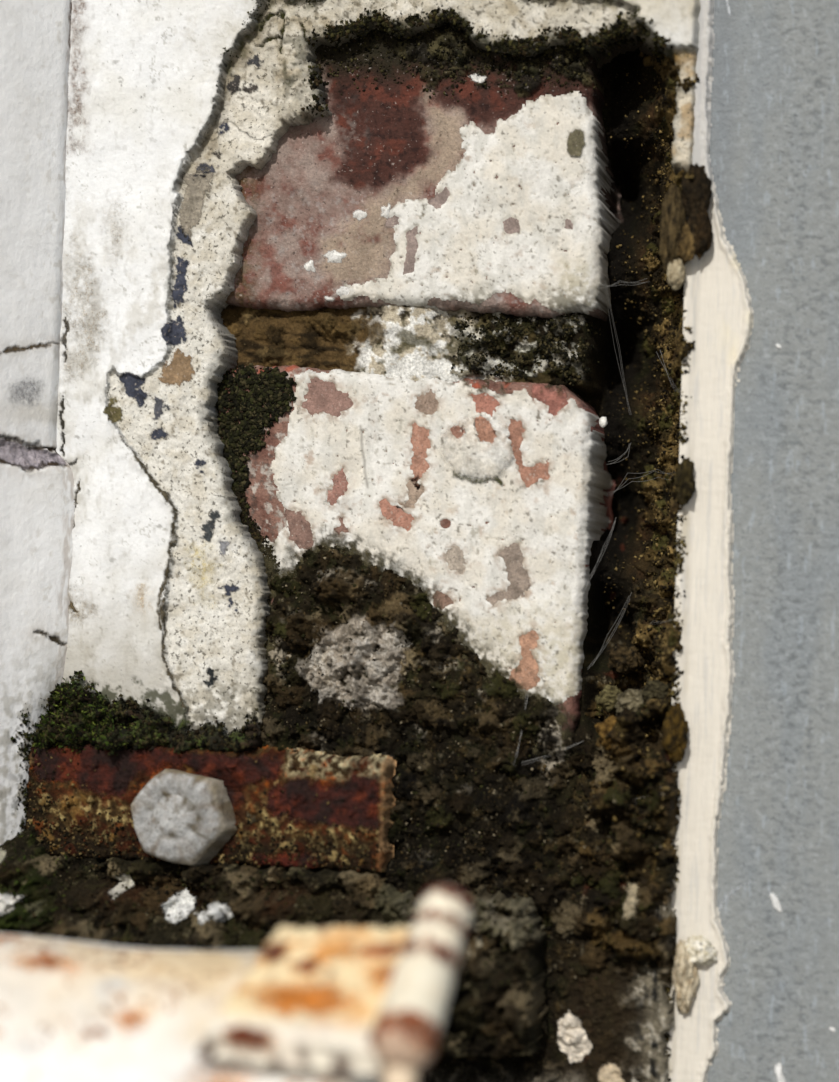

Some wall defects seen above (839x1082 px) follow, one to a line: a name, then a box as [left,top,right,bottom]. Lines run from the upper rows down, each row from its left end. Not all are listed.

crack [3,317,70,362]
peeling [103,0,713,735]
crack [0,396,81,528]
leakage [4,482,677,1012]
flaking render [662,702,689,764]
corrosion [30,743,382,833]
peeling [109,874,134,899]
peeling [162,889,233,924]
peeling [623,883,639,919]